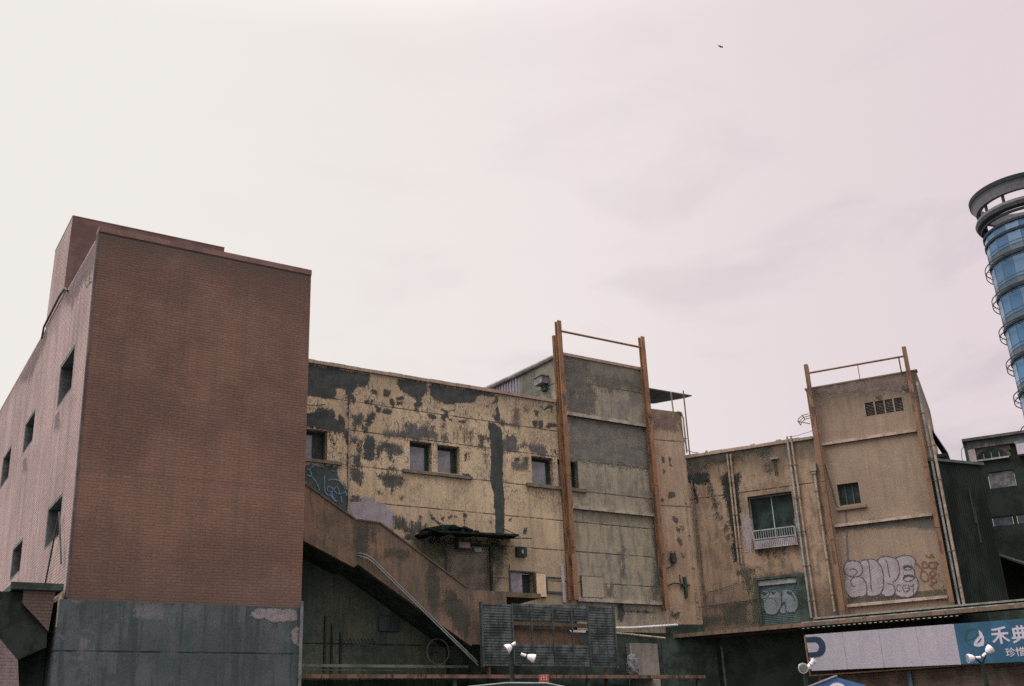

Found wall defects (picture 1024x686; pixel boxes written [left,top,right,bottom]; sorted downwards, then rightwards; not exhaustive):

peeling [307,364,495,502]
peeling [392,513,467,541]
leakage [687,446,787,627]